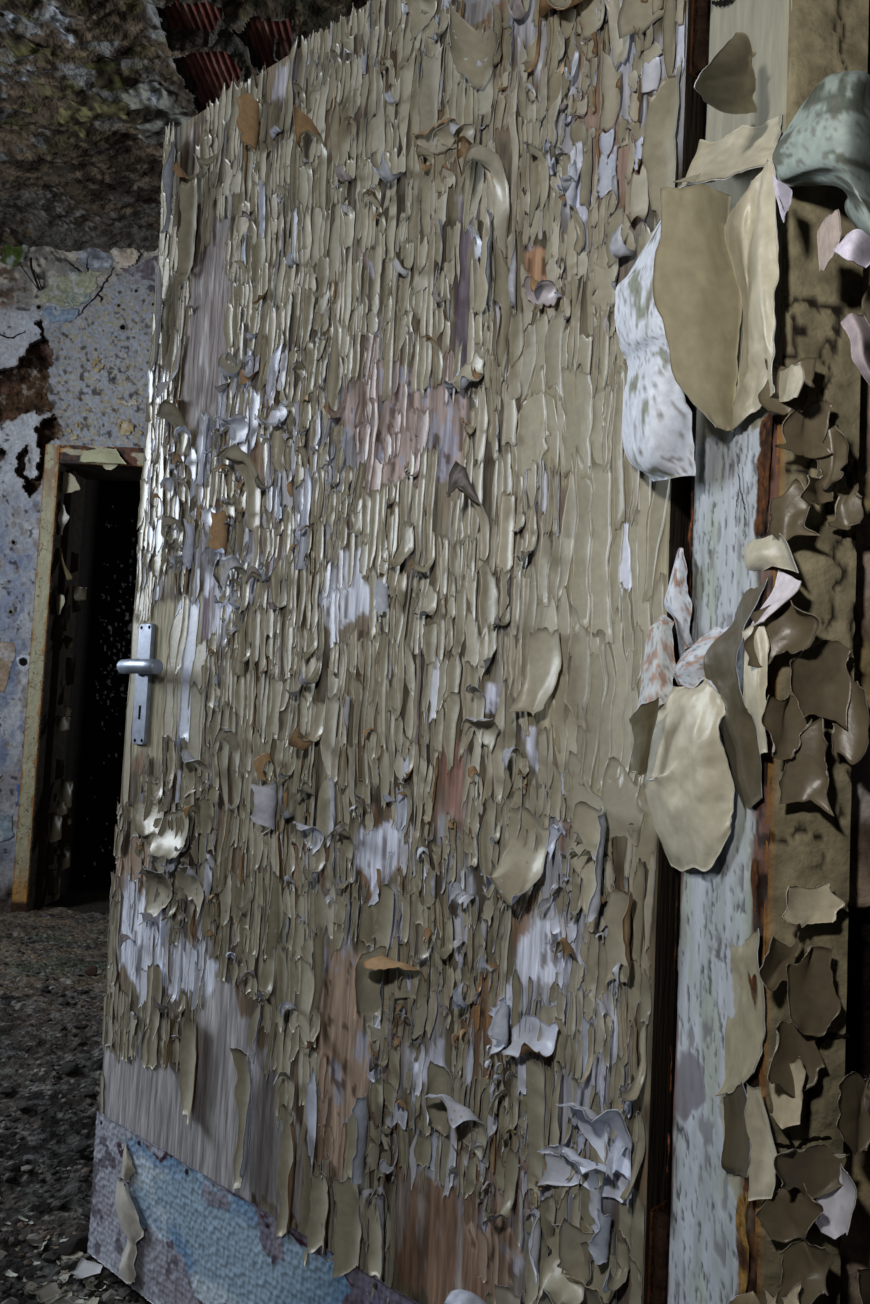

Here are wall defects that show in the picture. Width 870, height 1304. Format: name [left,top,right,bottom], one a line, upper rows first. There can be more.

peeling [694,32,758,114]
spalling [0,286,63,498]
peeling [54,448,126,732]
peeling [66,247,140,275]
peeling [102,0,686,1304]
peeling [614,220,870,816]
peeling [638,60,870,573]
peeling [47,759,73,901]
peeling [566,678,735,985]
peeling [715,881,870,1304]